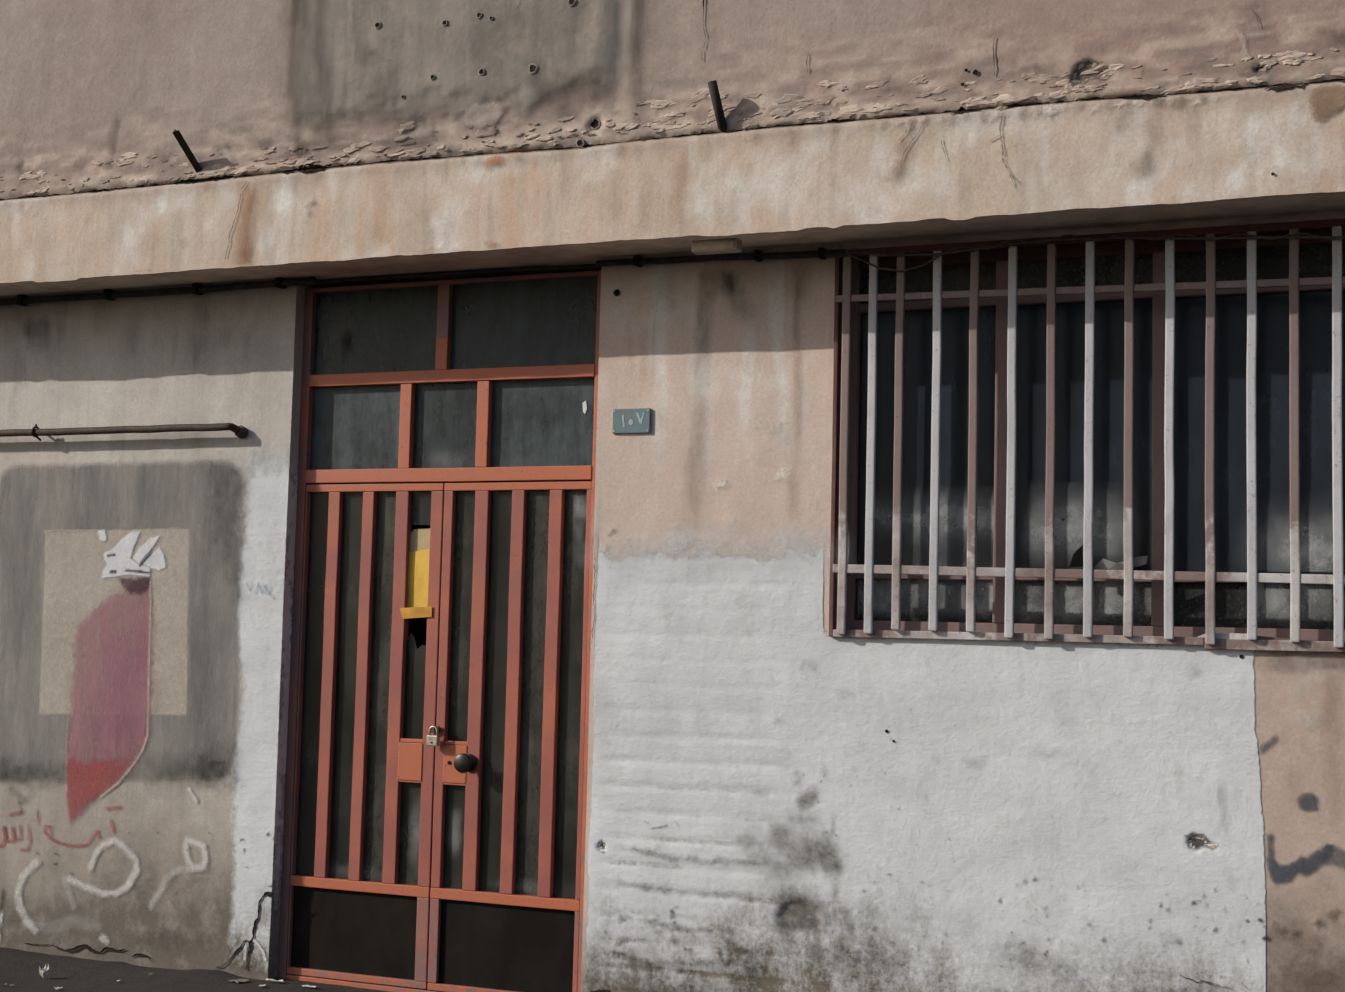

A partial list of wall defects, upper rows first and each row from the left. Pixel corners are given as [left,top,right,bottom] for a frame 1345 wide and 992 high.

peeling [0,48,1345,197]
water stain [777,898,820,934]